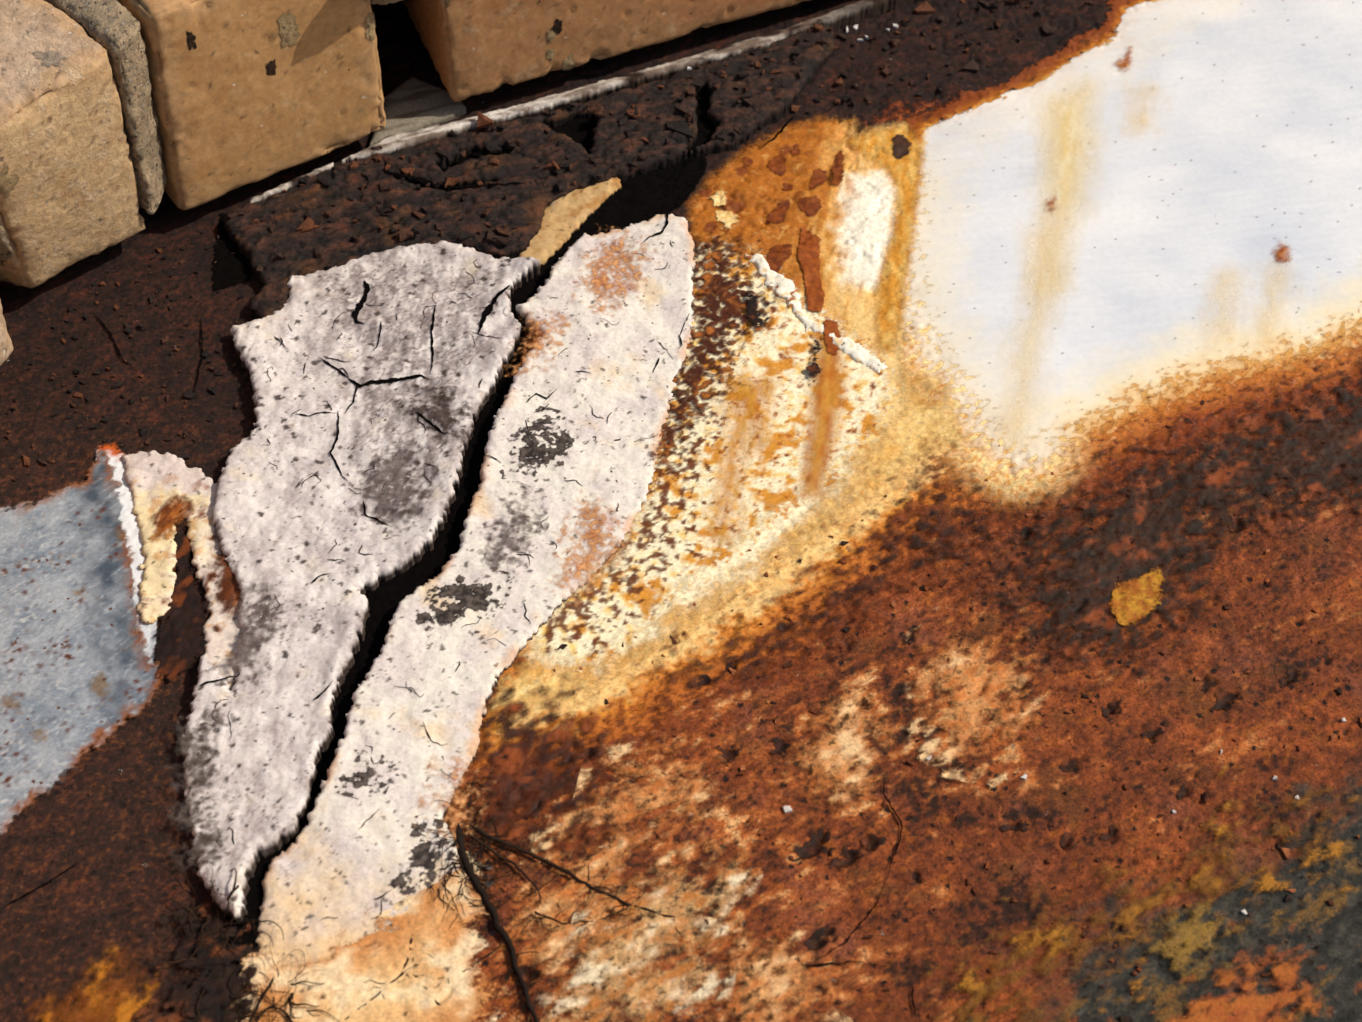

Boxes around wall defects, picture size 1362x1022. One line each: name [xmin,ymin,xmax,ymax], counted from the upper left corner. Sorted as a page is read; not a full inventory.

rust [1117,46,1132,70]
rust [293,111,527,251]
rust [573,230,649,312]
rust [1274,244,1291,262]
rust [27,264,290,459]
crack [216,133,707,984]
peeling [0,443,242,834]
crack [199,670,241,738]
rust [854,697,879,721]
rust [829,833,887,871]
rust [804,924,836,952]
rust [925,785,1360,1022]